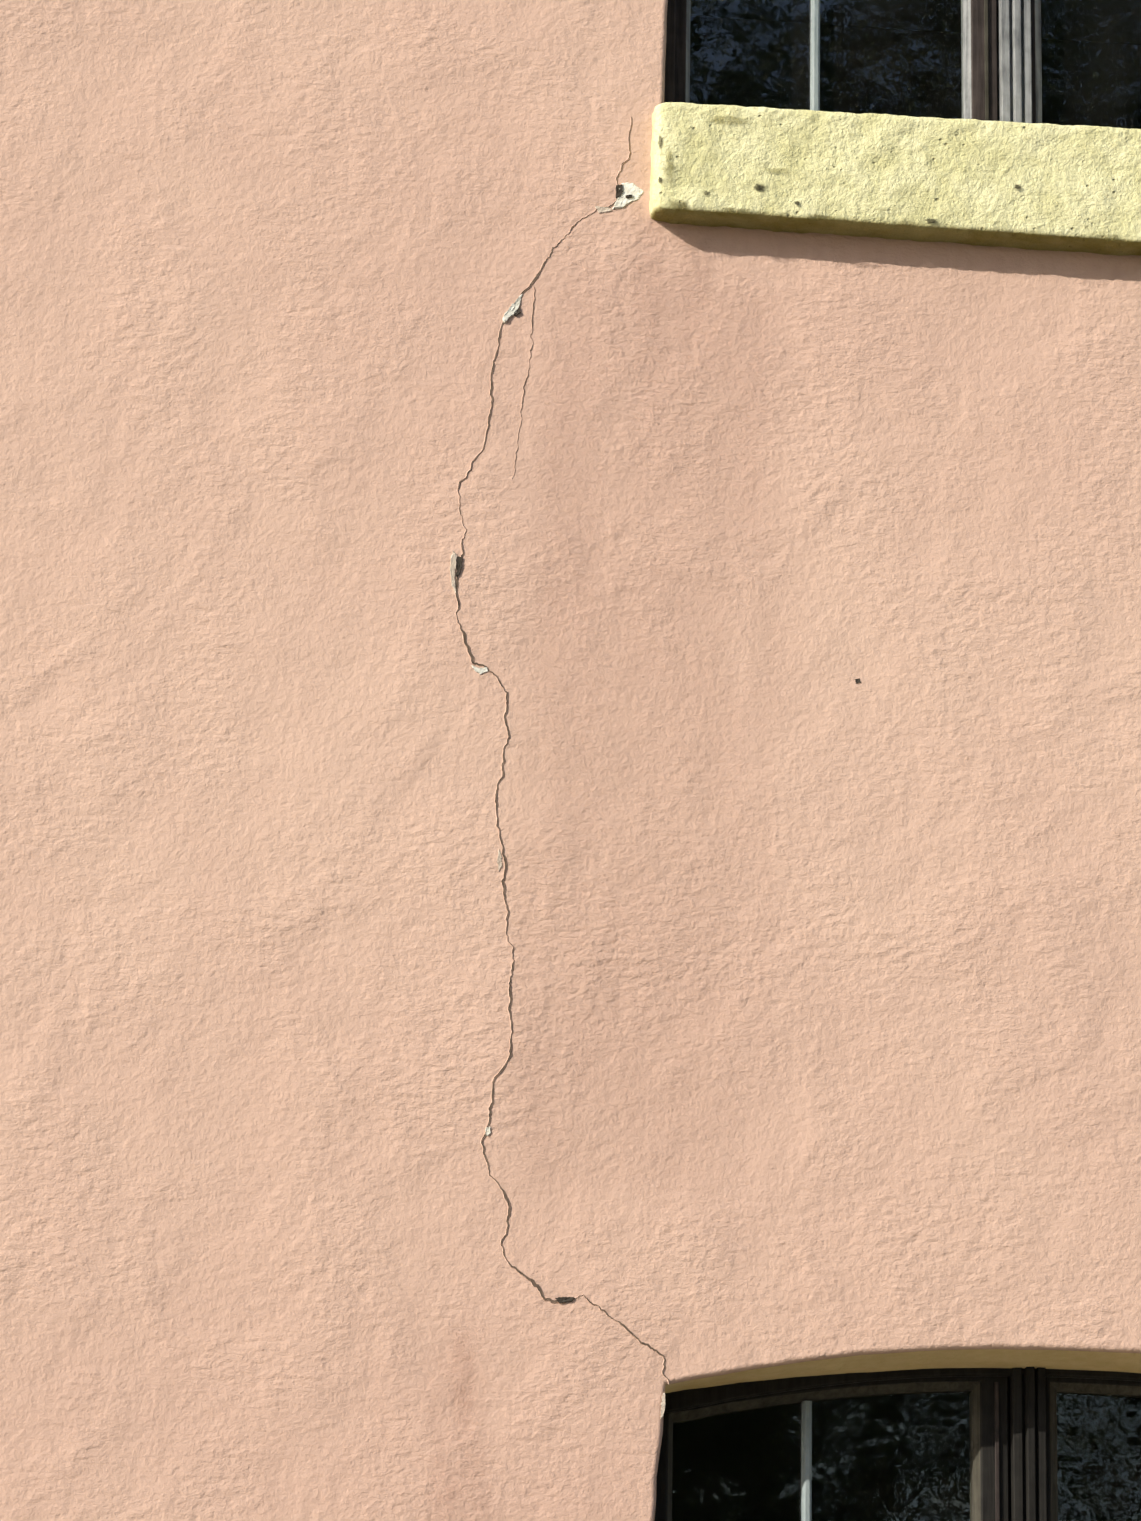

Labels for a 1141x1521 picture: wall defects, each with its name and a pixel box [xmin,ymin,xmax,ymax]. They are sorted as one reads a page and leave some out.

crack [450,118,670,1384]